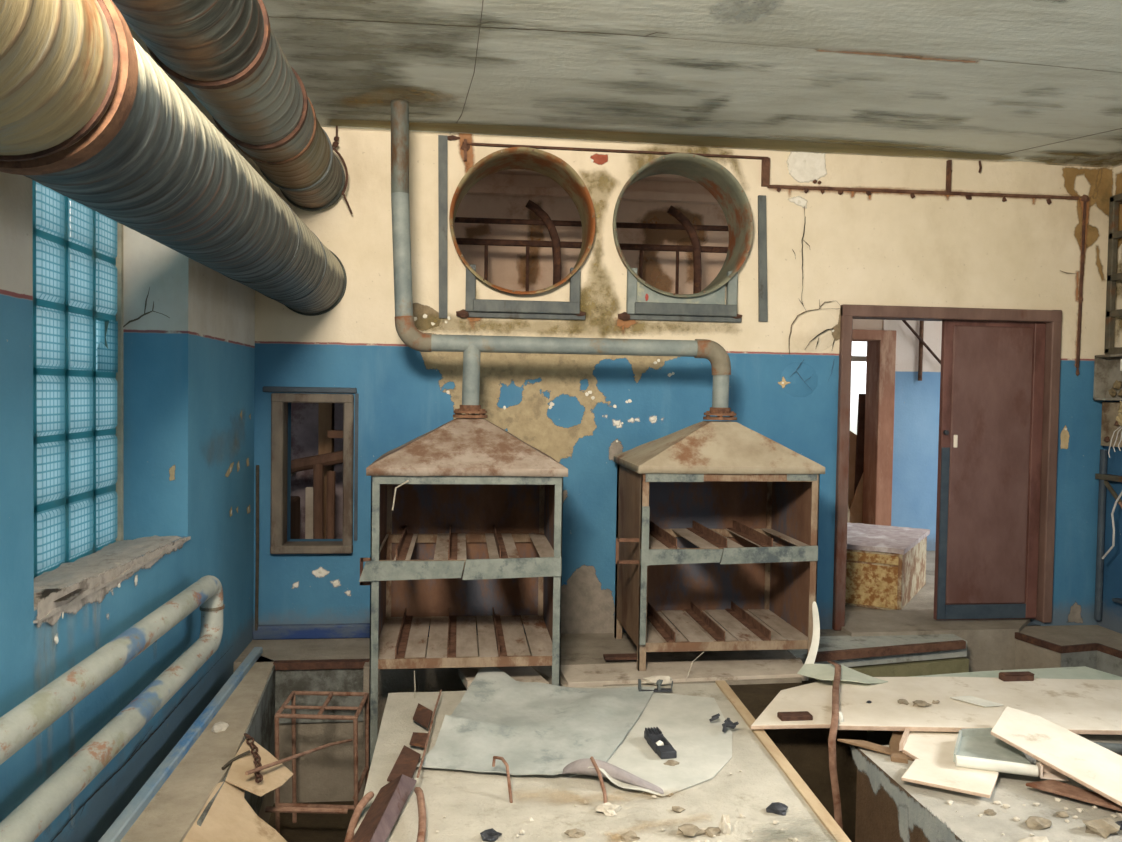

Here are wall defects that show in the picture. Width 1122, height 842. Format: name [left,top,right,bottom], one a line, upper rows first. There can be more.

water stain [283,0,1013,173]
rust [817,50,978,63]
water stain [418,317,529,333]
water stain [519,203,544,287]
water stain [541,173,689,336]
crack [789,216,841,389]
water stain [1029,152,1122,295]
peeling [420,351,680,462]
flaking render [37,538,185,644]
peeling [561,564,615,634]